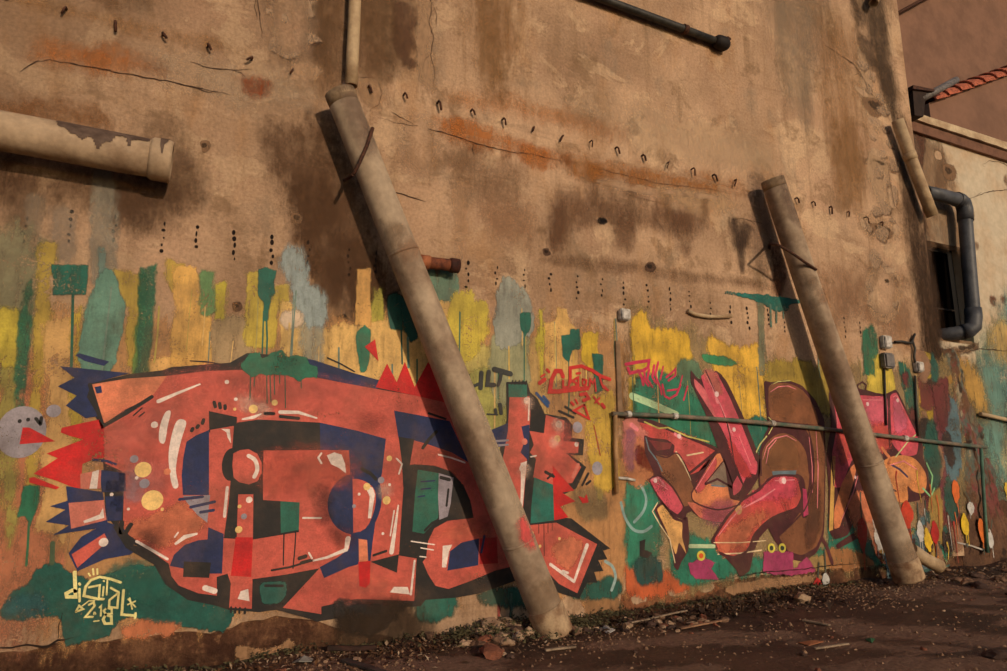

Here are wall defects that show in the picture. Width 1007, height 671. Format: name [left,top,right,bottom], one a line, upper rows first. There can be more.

crack [20,59,246,95]
water stain [393,2,418,68]
crack [422,0,437,84]
water stain [851,0,906,123]
water stain [264,116,400,315]
crack [362,77,730,230]
corrosion [442,118,718,194]
water stain [550,196,695,246]
peeling [855,47,900,239]
water stain [896,138,945,371]